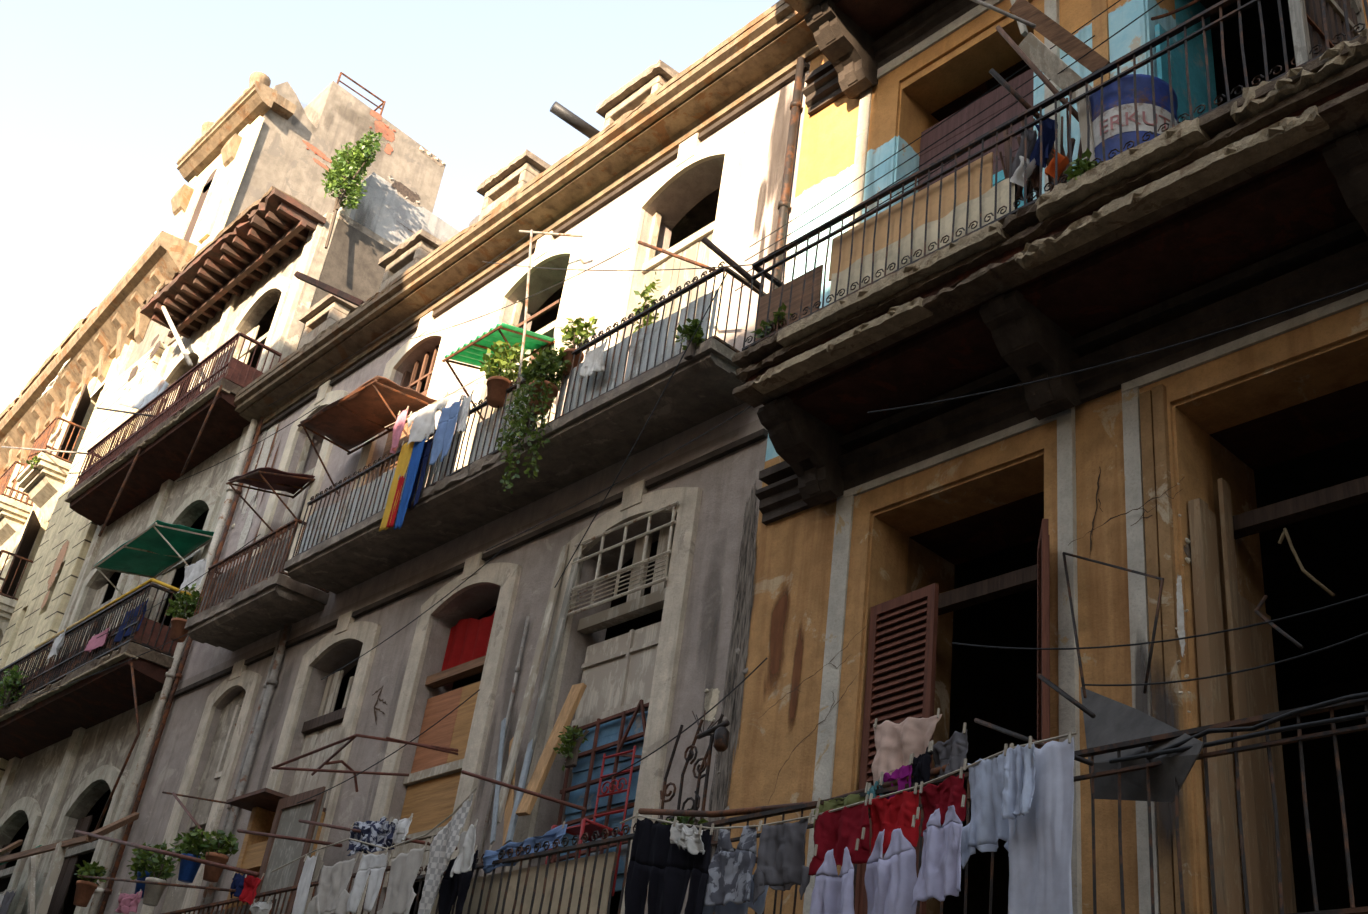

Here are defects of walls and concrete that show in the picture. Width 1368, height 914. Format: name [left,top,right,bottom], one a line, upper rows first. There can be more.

flaking render [370,110,396,155]
crack [1071,469,1184,552]
damp [764,589,803,725]